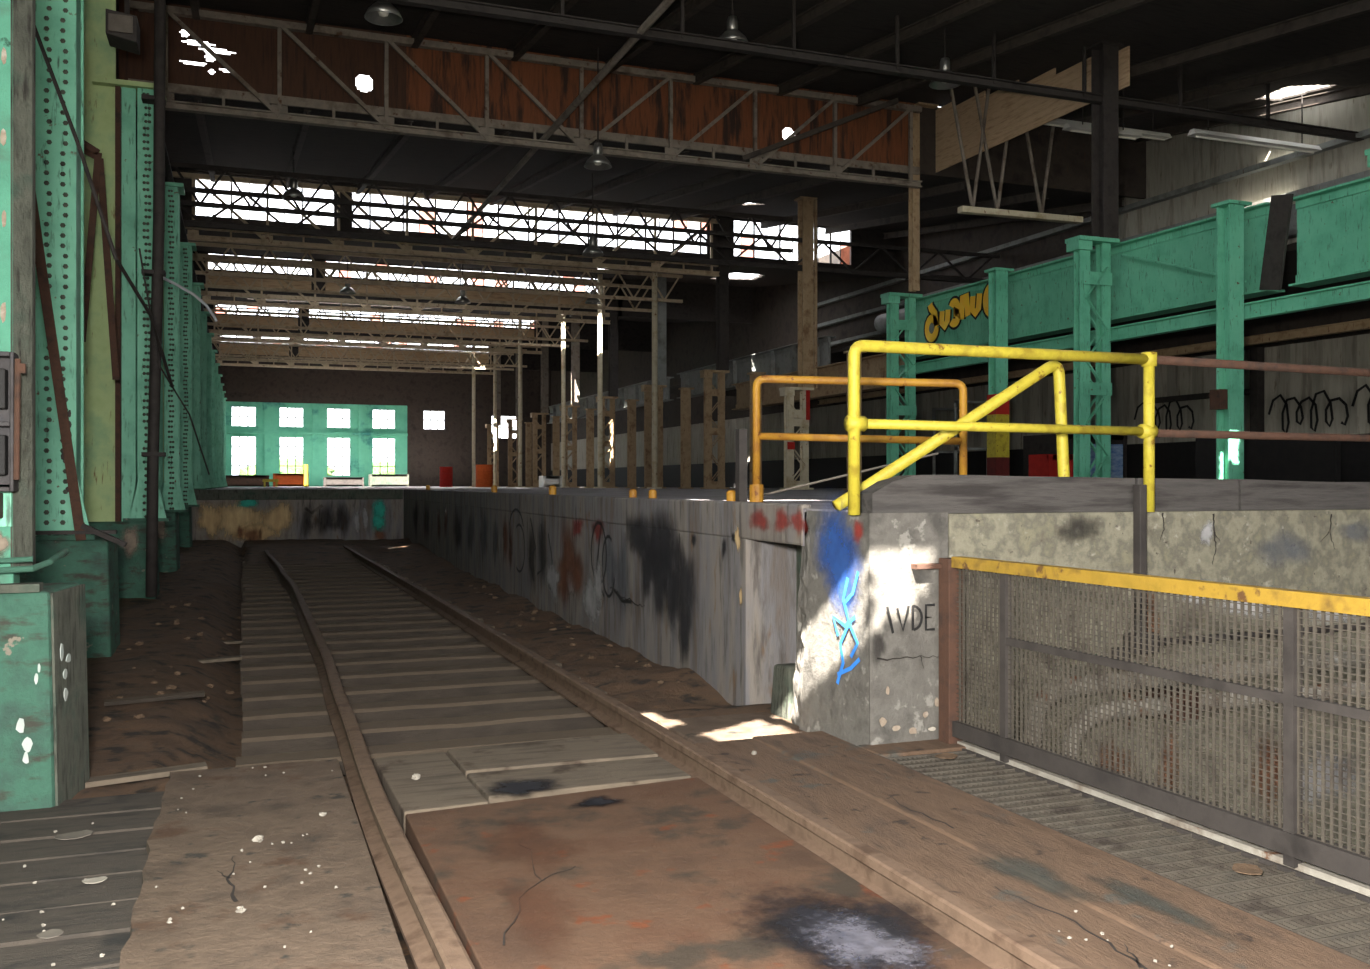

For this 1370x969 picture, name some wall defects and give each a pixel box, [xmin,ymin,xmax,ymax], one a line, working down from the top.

peeling [60,644,71,701]
peeling [16,718,33,764]
crack [994,886,1148,969]